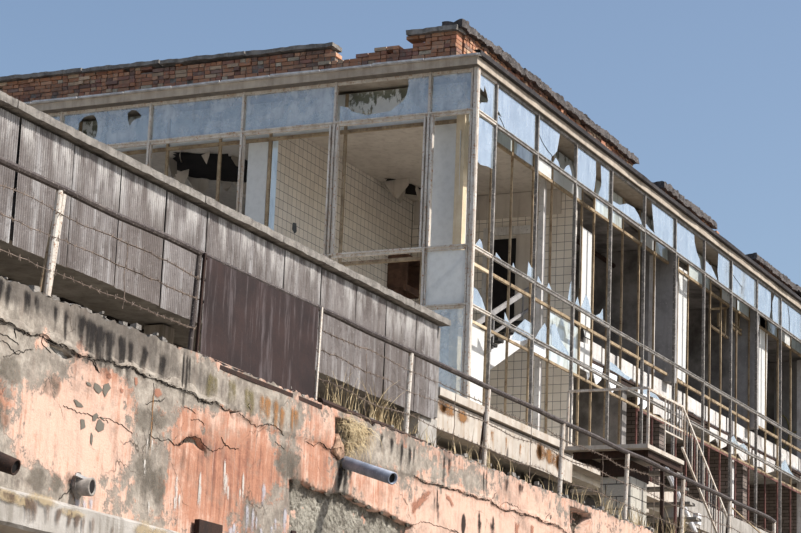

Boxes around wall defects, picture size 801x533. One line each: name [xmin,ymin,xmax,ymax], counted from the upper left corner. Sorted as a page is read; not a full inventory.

damp [96,326,148,375]
rust [195,253,323,428]
crack [0,312,284,452]
rust [438,400,467,423]
rust [537,442,559,470]
spalling [289,480,410,533]
peeling [412,491,430,513]
crack [413,472,567,533]